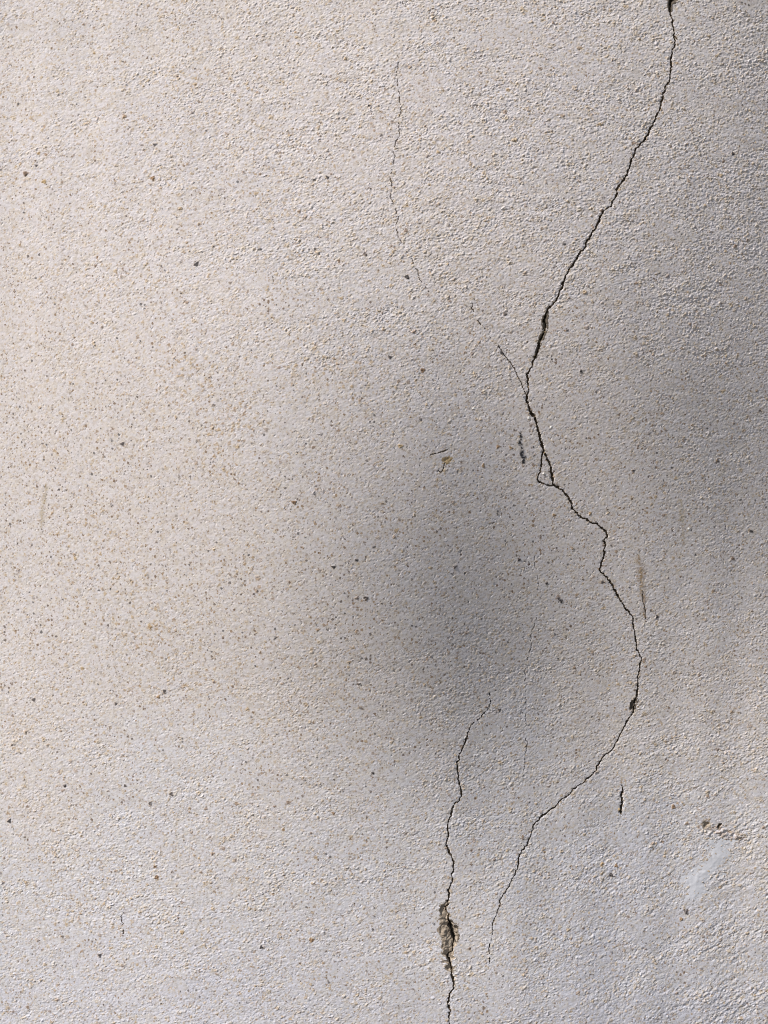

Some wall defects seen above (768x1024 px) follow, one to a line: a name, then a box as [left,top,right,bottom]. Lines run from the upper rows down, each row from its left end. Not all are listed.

crack [445,693,491,1024]
crack [488,0,678,963]